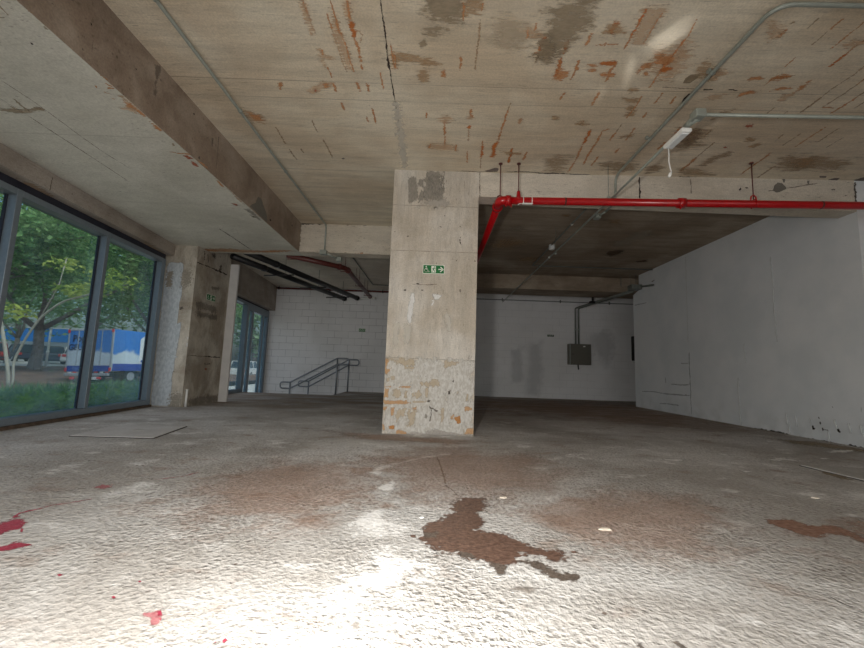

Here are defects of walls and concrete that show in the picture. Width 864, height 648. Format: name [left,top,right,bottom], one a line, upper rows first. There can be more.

corrosion [326,0,370,92]
crack [380,0,407,168]
damp [529,0,602,64]
corrosion [553,41,618,82]
corrosion [480,111,509,157]
peeling [382,356,475,436]
damp [324,497,586,614]